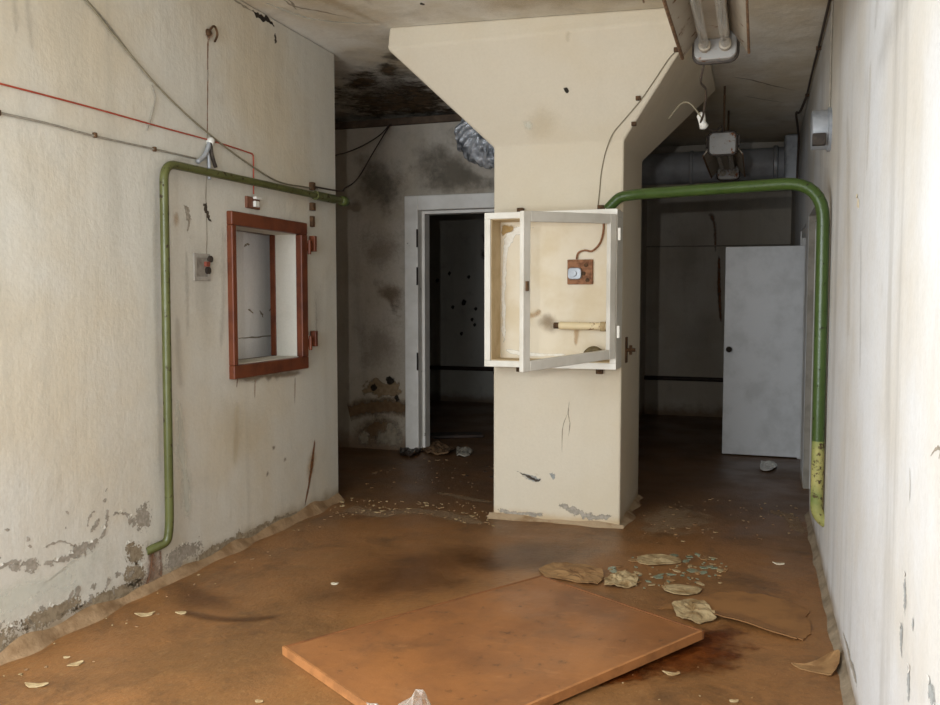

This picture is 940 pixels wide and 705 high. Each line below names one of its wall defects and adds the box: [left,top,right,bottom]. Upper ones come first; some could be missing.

damp [335,55,455,118]
damp [426,153,479,188]
damp [347,398,405,445]
spalling [517,471,555,482]
spalling [0,489,151,651]
spalling [162,512,297,573]
peeling [899,571,913,653]
peeling [926,674,935,705]